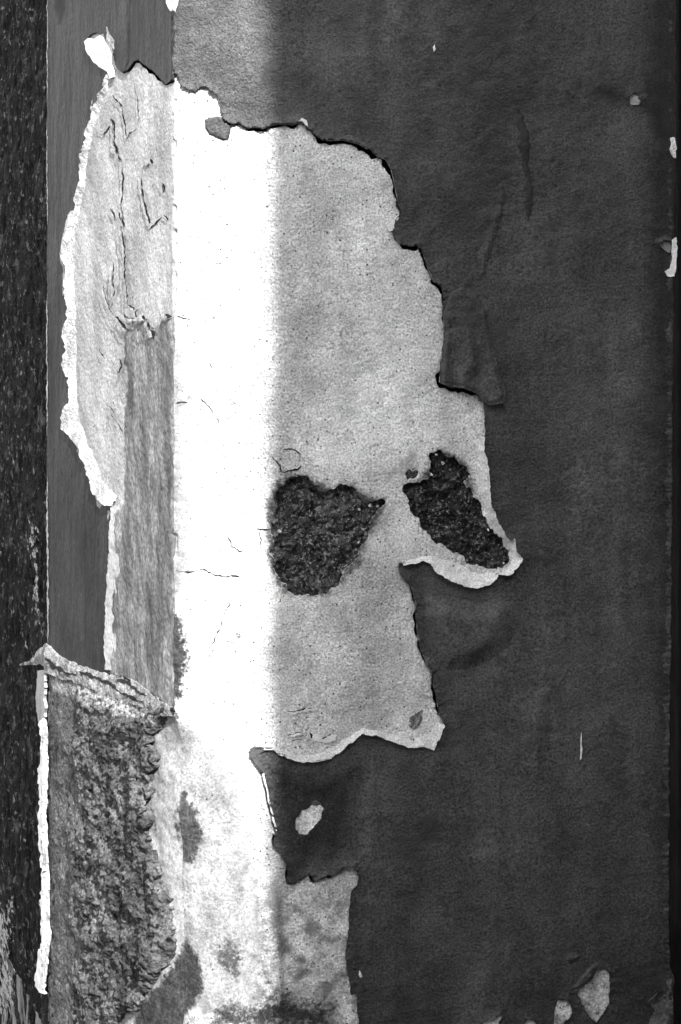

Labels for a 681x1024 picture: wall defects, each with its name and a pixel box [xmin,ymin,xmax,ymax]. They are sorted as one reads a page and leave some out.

crack [97,0,190,338]
peeling [34,27,523,1024]
peeling [553,962,610,1024]